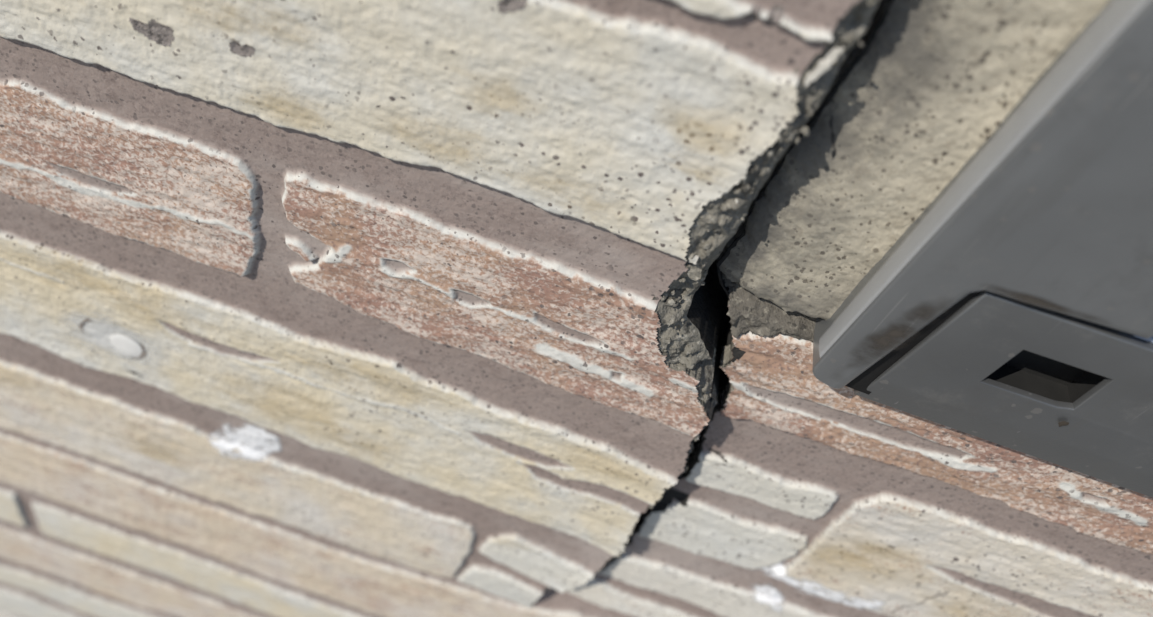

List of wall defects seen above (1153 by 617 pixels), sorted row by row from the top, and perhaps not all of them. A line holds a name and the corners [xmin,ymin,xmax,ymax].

peeling [229,41,255,57]
crack [532,0,894,606]